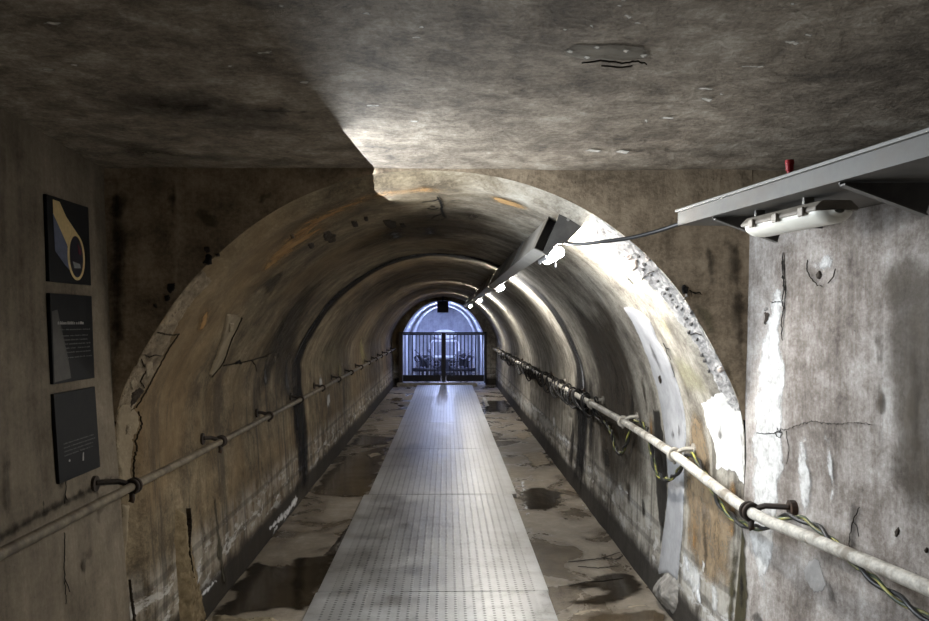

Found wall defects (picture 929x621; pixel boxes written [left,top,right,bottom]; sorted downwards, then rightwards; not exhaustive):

spalling [116,247,220,480]
flaking render [209,313,243,377]
leakage [259,253,501,485]
leakage [508,275,667,542]
spalling [589,216,745,484]
crack [770,252,786,341]
crack [757,420,870,464]